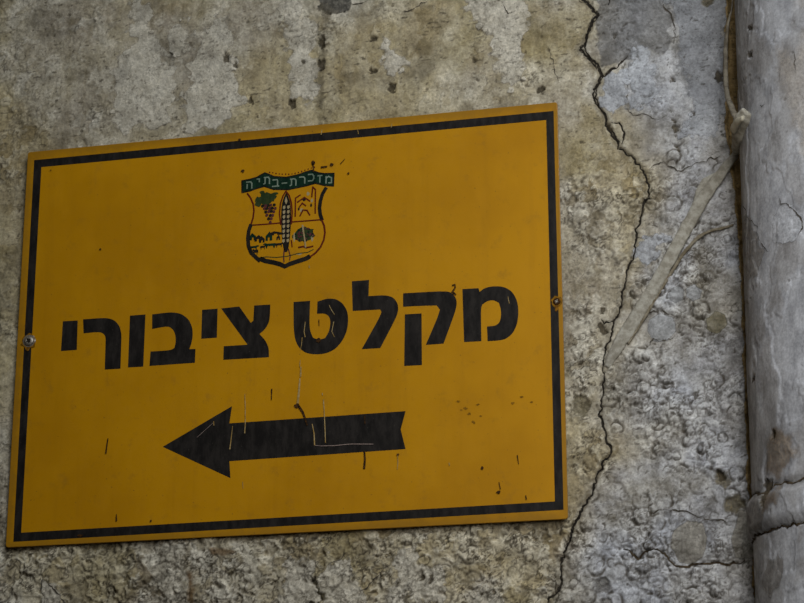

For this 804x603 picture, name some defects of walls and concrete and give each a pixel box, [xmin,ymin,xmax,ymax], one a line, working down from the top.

crack [547,0,718,603]
crack [751,477,804,498]
crack [646,509,731,523]
crack [623,522,804,568]